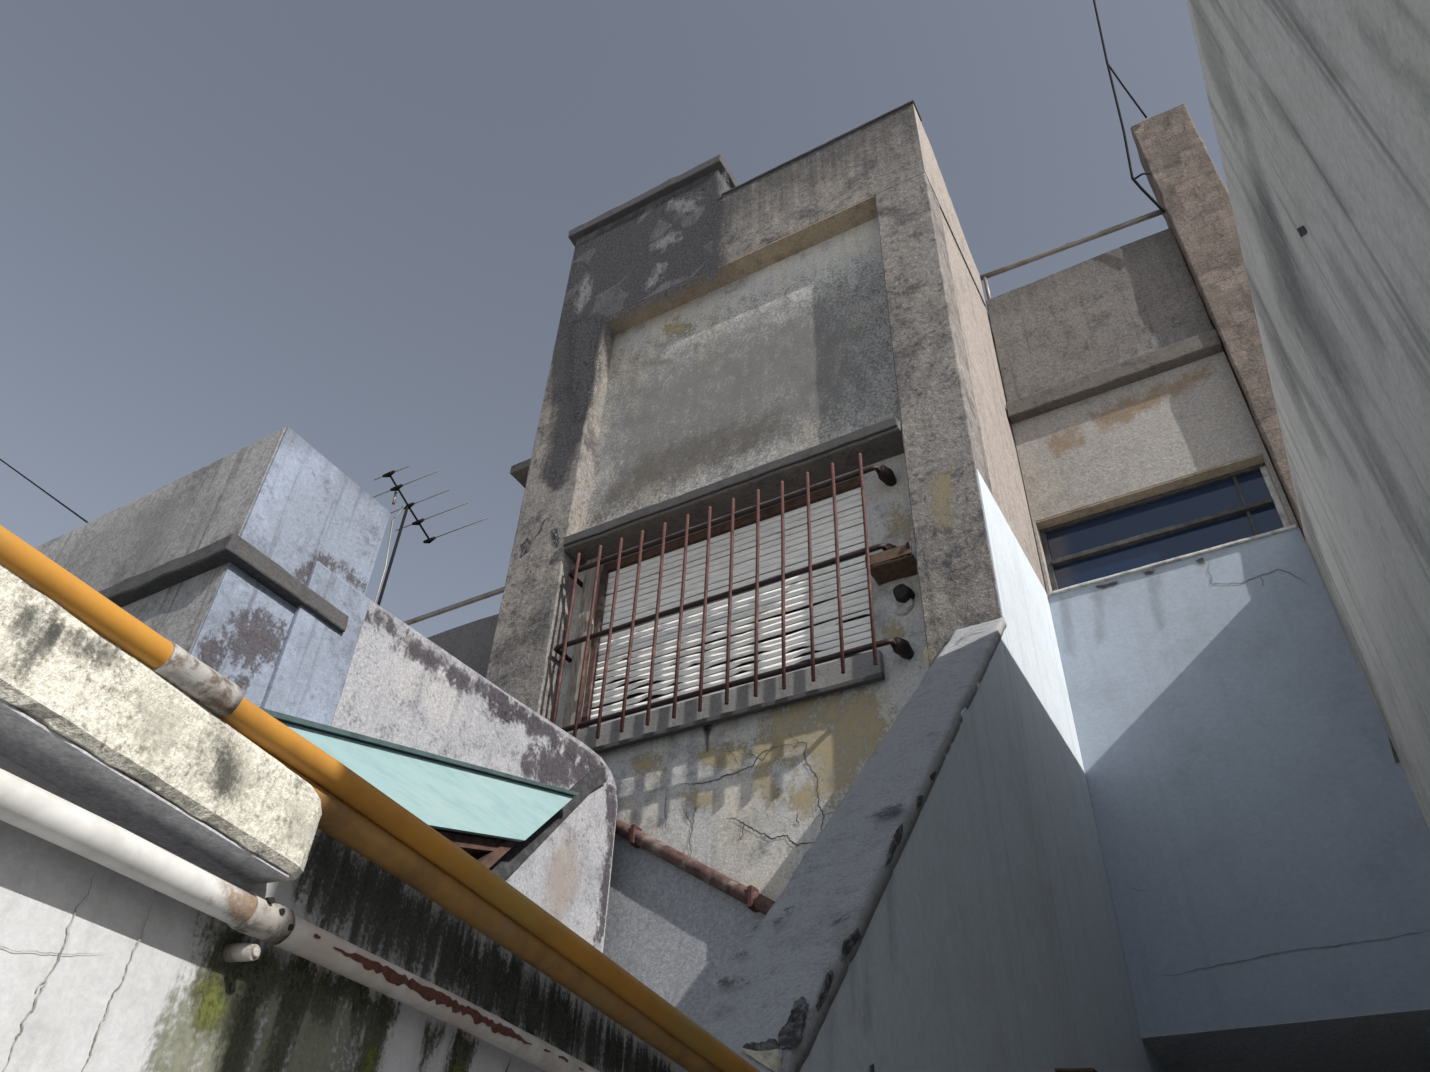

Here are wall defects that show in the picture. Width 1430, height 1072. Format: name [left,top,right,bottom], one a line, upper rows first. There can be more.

leakage [543,173,899,529]
leakage [196,607,287,689]
crack [1208,565,1310,587]
leakage [365,608,617,946]
crack [664,733,834,856]
spalling [885,823,903,867]
crack [0,872,97,1072]
crack [82,892,157,1071]
leakage [192,926,400,1072]
leakage [294,828,671,1072]
spalling [739,928,862,1072]
crack [1165,930,1430,976]